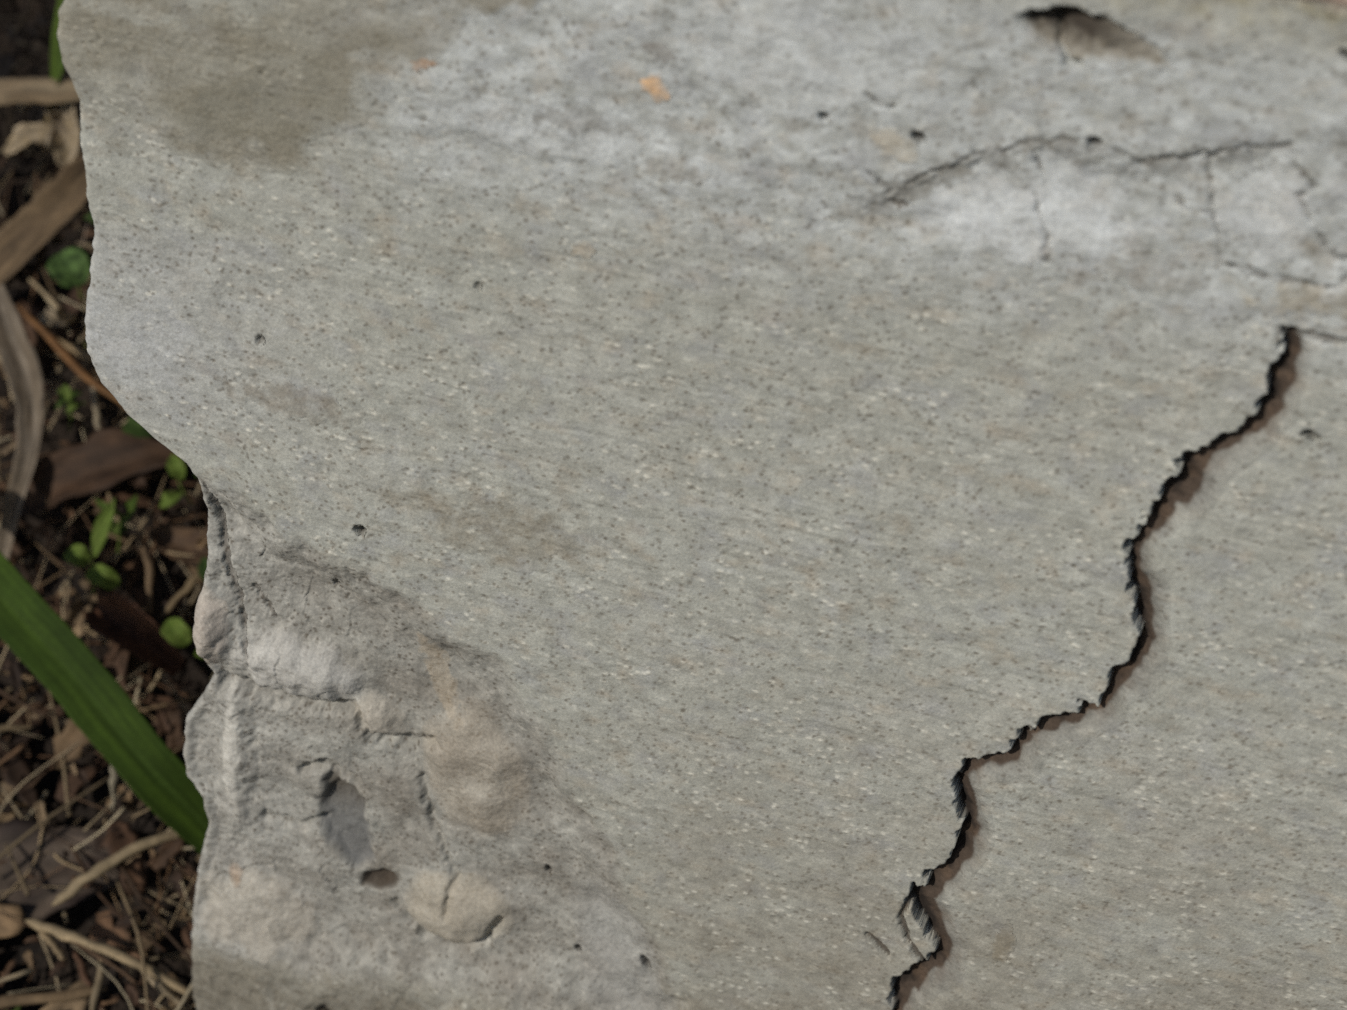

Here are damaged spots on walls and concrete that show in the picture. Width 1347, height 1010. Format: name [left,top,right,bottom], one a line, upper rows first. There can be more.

crack [830,125,1347,289]
spalling [1018,5,1179,72]
spalling [183,473,689,1010]
crack [867,325,1347,1010]